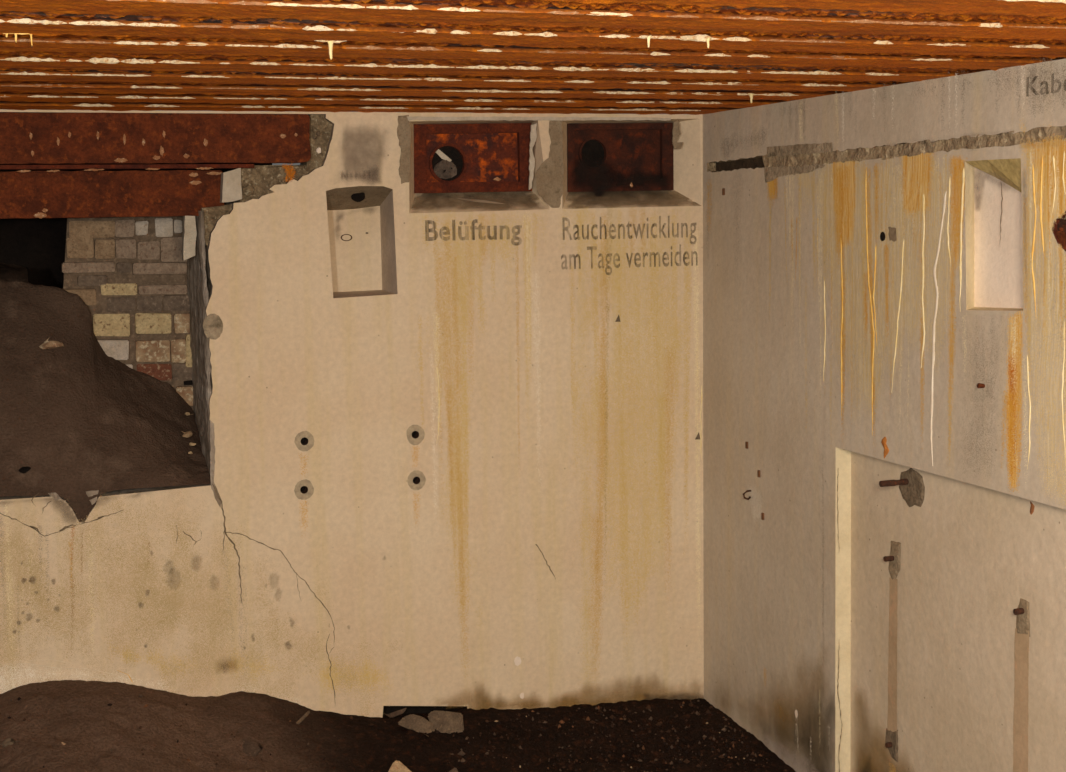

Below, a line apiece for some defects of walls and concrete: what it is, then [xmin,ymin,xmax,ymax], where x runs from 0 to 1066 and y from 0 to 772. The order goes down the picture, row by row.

leakage [0,18,180,27]
spalling [182,115,332,261]
rust [767,141,968,466]
rust [1001,119,1066,511]
spalling [1056,216,1066,249]
crack [0,493,123,537]
spalling [210,420,221,508]
leakage [411,204,703,707]
crack [176,485,335,697]
leakage [762,690,830,772]